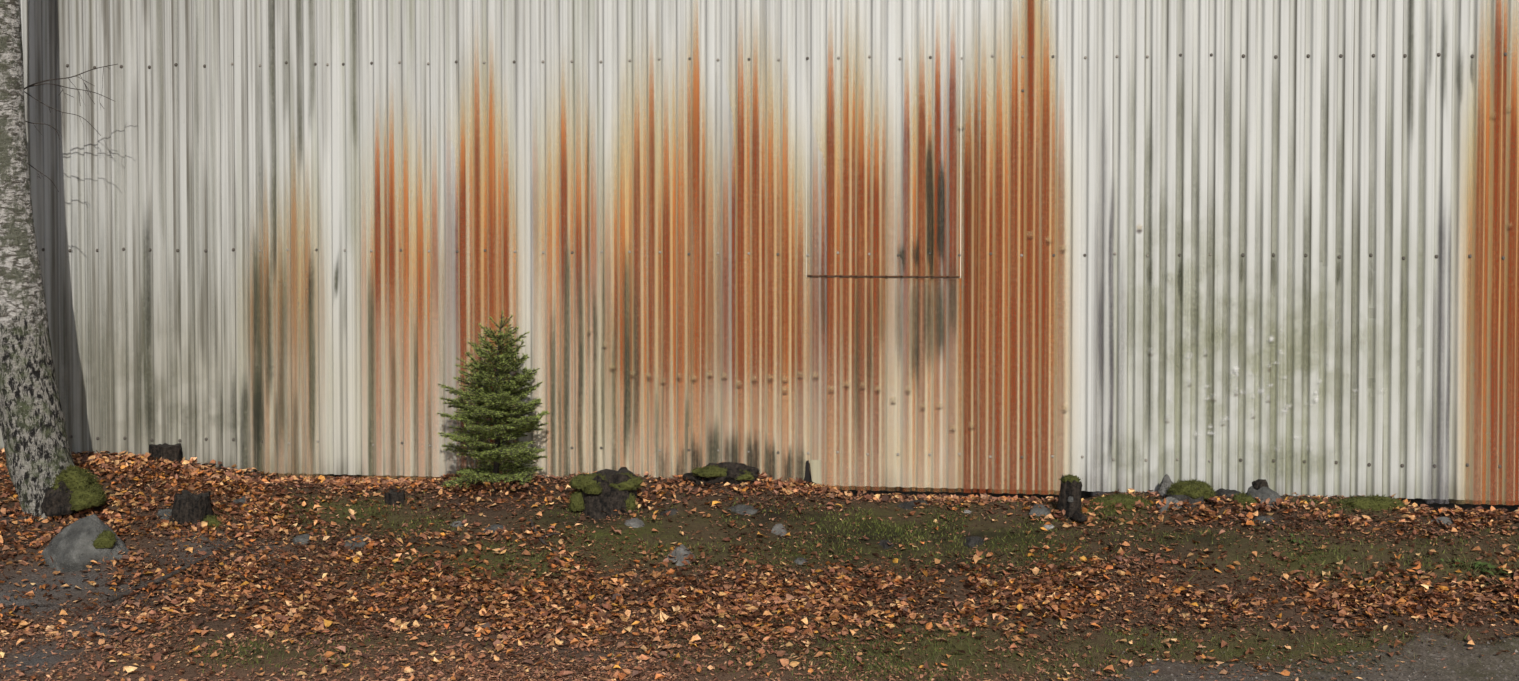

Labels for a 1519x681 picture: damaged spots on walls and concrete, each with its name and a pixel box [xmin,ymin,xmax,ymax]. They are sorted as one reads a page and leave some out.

corrosion [372,133,438,405]
corrosion [456,83,516,473]
corrosion [540,38,886,491]
water stain [912,285,954,361]
corrosion [904,0,1062,495]
corrosion [1469,0,1519,505]